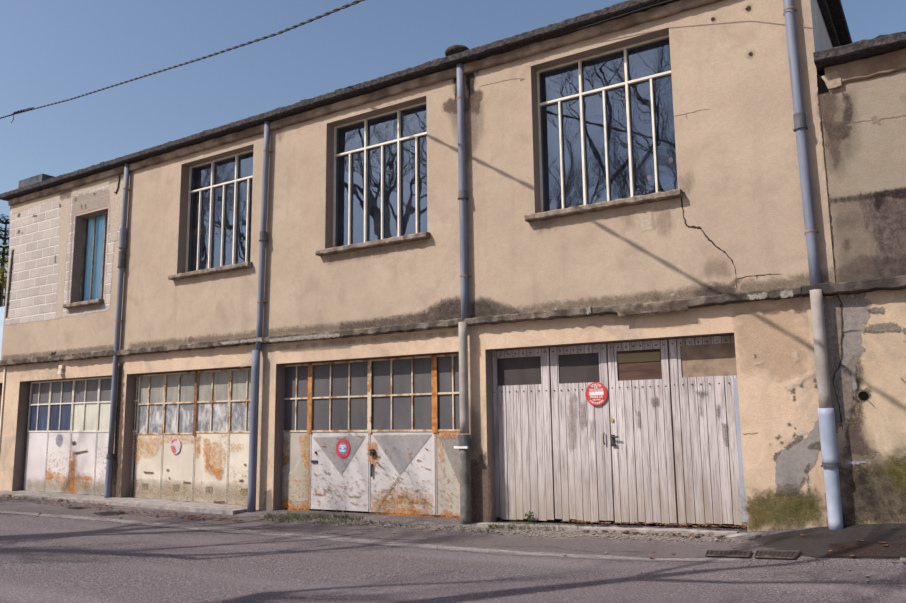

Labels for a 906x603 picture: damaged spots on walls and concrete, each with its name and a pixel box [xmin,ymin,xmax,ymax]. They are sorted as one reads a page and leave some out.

damp [443,71,482,113]
damp [818,92,852,168]
crack [848,115,906,125]
crack [681,192,783,288]
crack [817,85,862,429]
damp [860,190,906,269]
damp [269,273,833,336]
spalling [865,307,906,334]
spalling [851,367,871,402]
flaking render [769,420,821,497]
damp [843,365,906,525]